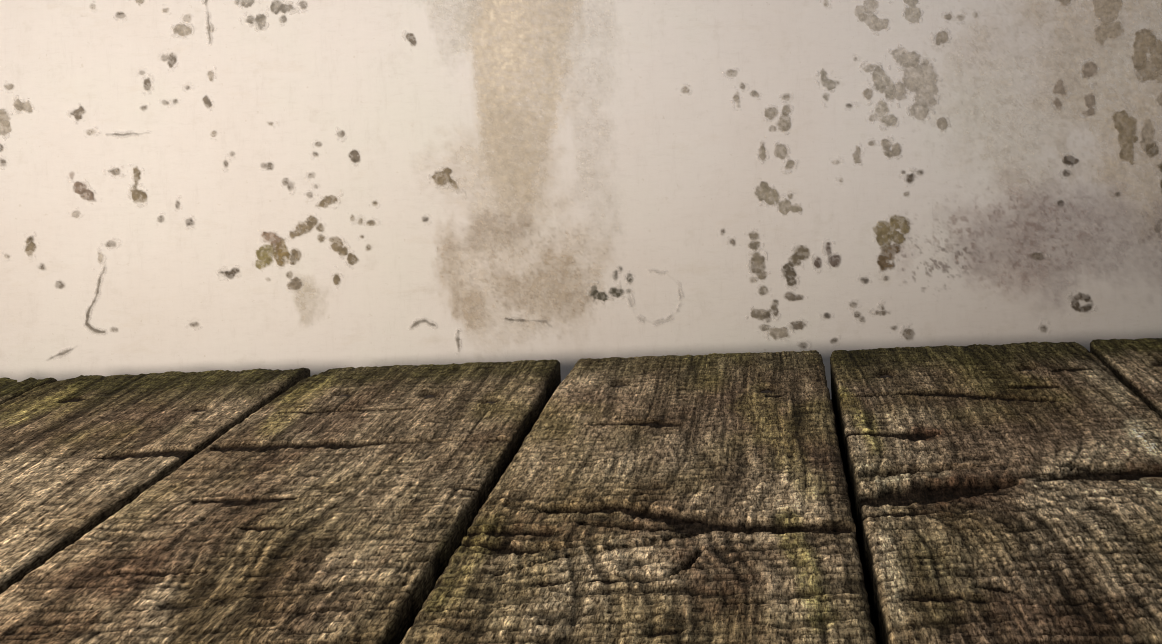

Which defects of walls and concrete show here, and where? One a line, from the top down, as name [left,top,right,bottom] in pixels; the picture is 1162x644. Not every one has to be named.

peeling [855,0,889,35]
peeling [1094,0,1162,105]
peeling [0,84,32,163]
leakage [456,0,574,202]
peeling [757,95,797,174]
peeling [853,45,950,196]
peeling [1113,110,1162,188]
peeling [755,182,802,214]
peeling [256,194,374,290]
peeling [875,215,910,280]
crack [85,267,105,333]
peeling [746,233,840,348]